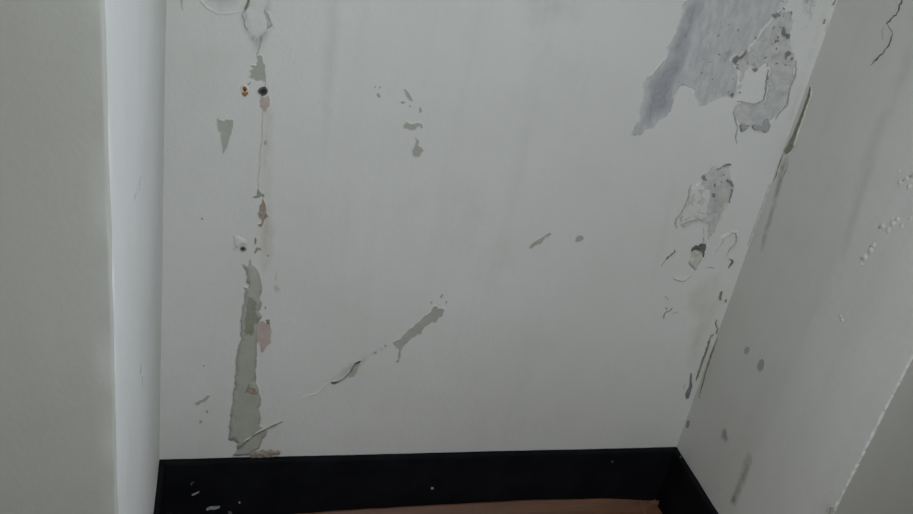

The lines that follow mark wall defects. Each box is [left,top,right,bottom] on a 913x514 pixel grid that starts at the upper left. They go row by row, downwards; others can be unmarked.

crack [870,0,902,65]
peeling [631,0,797,143]
peeling [216,118,235,154]
peeling [401,88,424,158]
peeling [783,85,813,156]
peeling [253,189,270,228]
peeling [675,162,735,271]
peeling [228,238,282,458]
peeling [330,359,363,385]
peeling [374,294,448,363]
peeling [683,372,693,400]